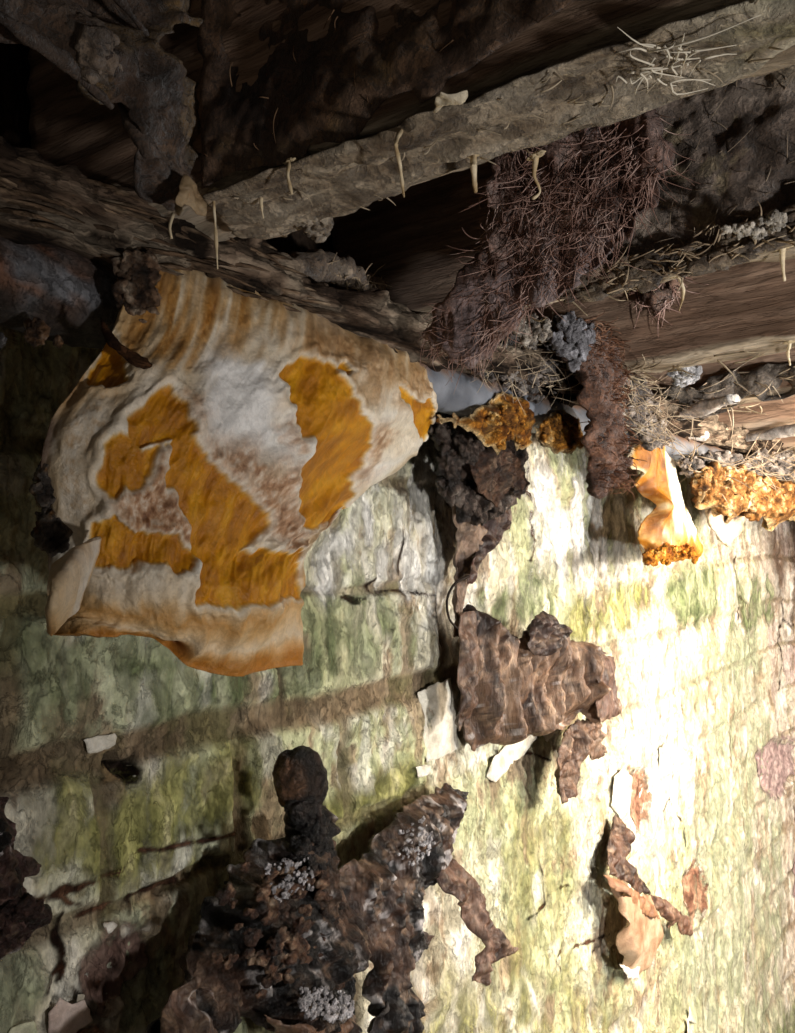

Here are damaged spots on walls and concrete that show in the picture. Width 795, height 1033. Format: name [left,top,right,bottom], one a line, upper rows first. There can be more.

peeling [486,729,559,782]
spalling [0,875,45,949]
spalling [210,862,344,999]
spalling [681,860,709,924]